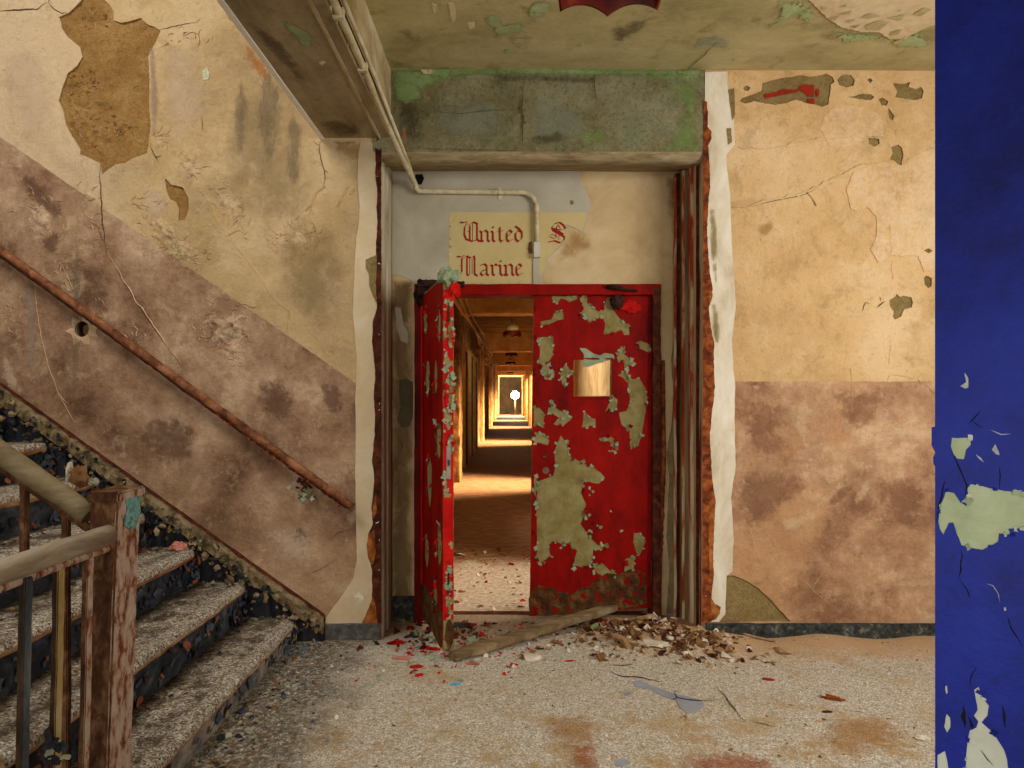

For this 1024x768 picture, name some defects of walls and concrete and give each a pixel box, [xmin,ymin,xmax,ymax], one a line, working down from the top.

spalling [60,0,160,173]
peeling [771,0,935,48]
crack [90,173,183,368]
peeling [133,142,590,707]
peeling [531,400,645,579]
corrosion [702,101,721,623]
crack [733,162,884,208]
flaking render [705,71,935,622]
peeling [951,435,973,459]
peeling [937,484,1024,551]
peeling [937,751,948,768]
peeling [963,687,1008,768]